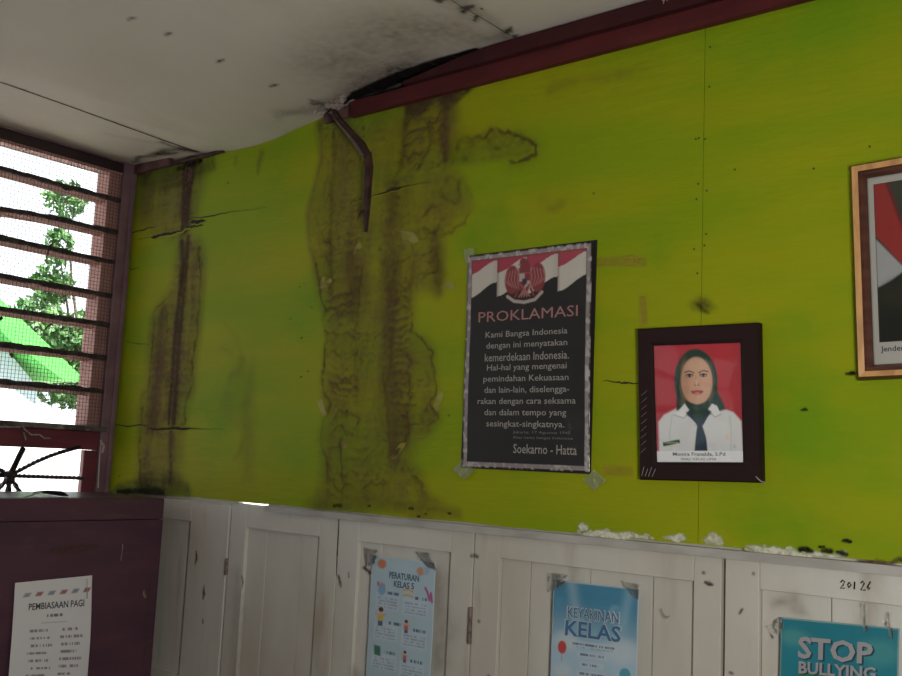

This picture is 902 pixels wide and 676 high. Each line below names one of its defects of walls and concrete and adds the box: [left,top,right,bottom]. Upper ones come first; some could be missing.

crack [132,207,266,241]
damp [116,145,213,497]
crack [115,424,226,432]
peeling [577,523,654,540]
peeling [705,533,723,545]
peeling [743,544,845,558]